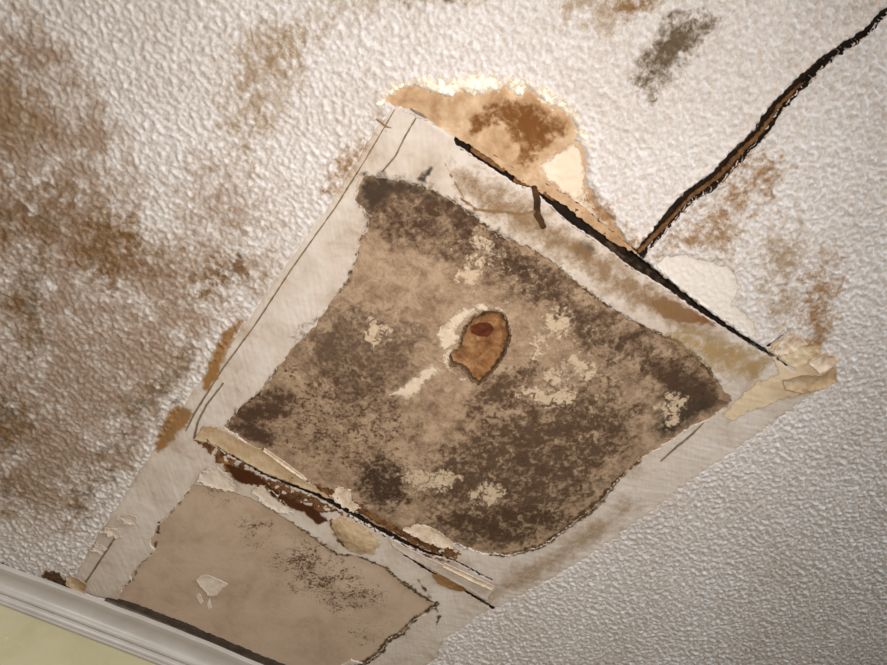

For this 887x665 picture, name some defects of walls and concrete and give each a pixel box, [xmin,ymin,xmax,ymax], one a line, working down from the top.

leakage [2,271,44,344]
leakage [0,182,155,292]
leakage [114,345,192,420]
leakage [190,254,249,296]
crack [185,108,427,438]
leakage [228,167,769,549]
peeling [375,72,637,254]
peeling [224,175,839,555]
crack [454,7,887,366]
peeling [89,514,137,556]
peeling [118,467,436,665]
crack [217,446,495,609]